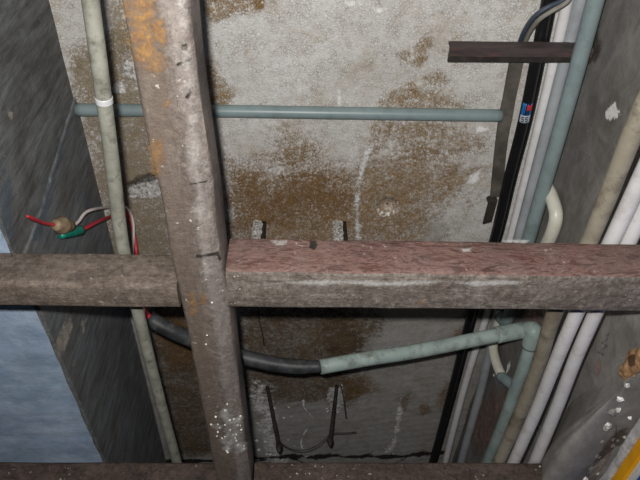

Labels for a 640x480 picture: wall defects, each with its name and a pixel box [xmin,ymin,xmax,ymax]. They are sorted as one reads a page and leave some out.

corrosion [125,0,164,70]
water stain [382,72,464,108]
water stain [224,121,484,241]
water stain [240,307,383,360]
water stain [243,366,372,417]
crack [166,457,213,465]
crack [254,451,445,463]